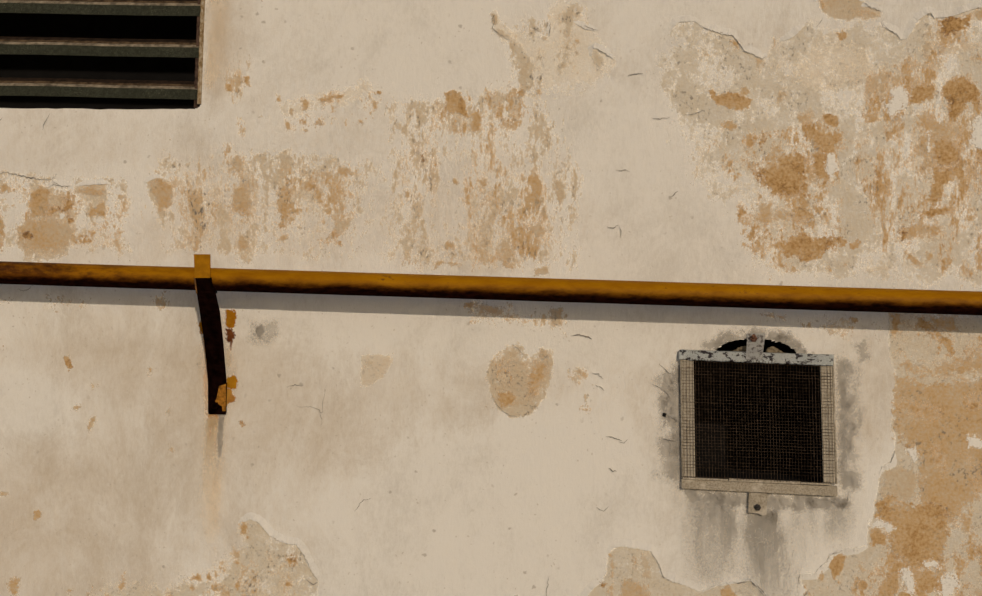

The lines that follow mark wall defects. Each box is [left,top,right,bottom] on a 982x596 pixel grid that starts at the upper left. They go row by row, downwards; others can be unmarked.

peeling [141,0,616,277]
peeling [657,0,982,290]
peeling [0,170,131,262]
peeling [464,300,567,337]
peeling [485,341,553,419]
leakage [703,328,807,354]
leakage [659,340,870,574]
peeling [798,312,982,596]
peeling [86,512,321,596]
peeling [580,539,768,596]